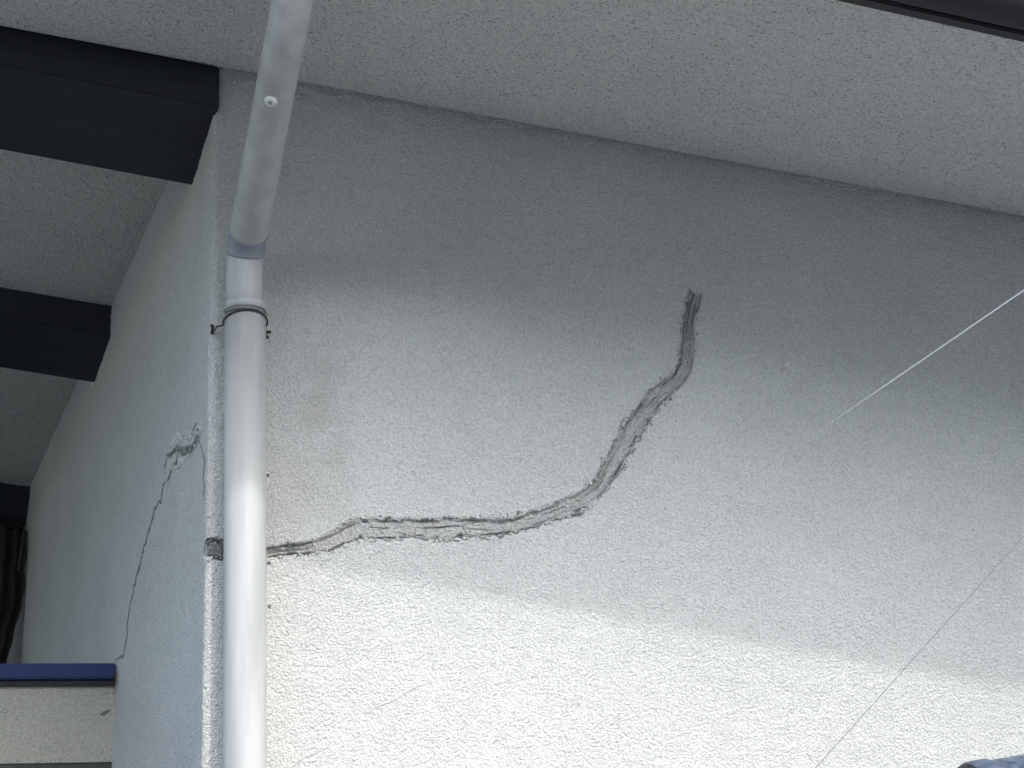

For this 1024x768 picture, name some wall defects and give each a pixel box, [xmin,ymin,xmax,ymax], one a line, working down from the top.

crack [115,423,221,662]
crack [266,289,701,560]